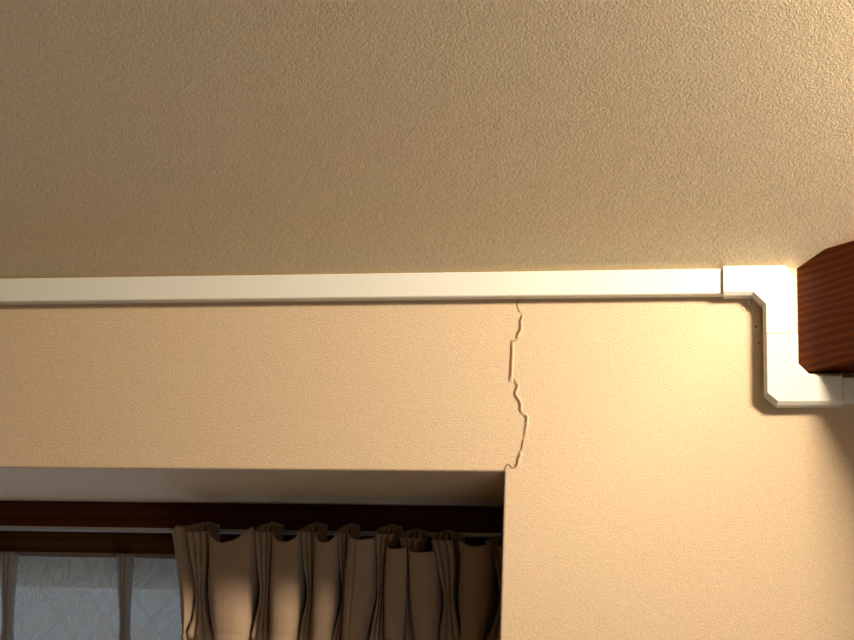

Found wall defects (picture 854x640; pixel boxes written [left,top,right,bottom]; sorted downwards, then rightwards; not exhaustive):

crack [504,300,529,471]